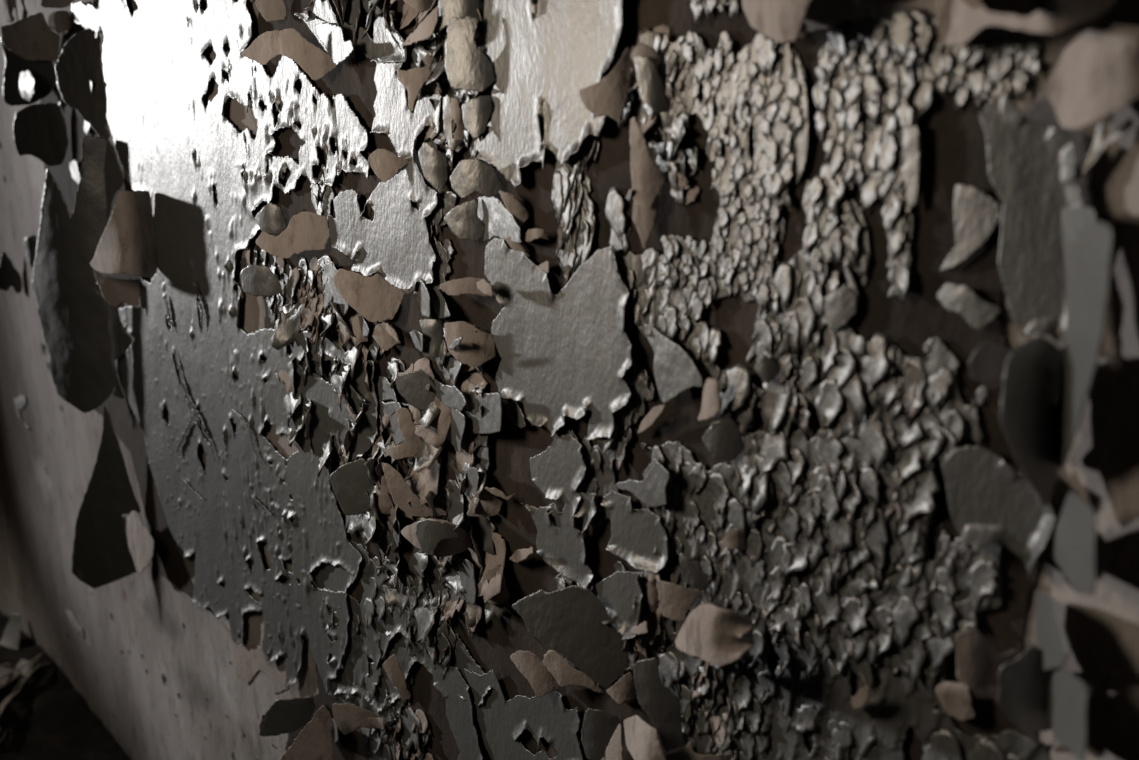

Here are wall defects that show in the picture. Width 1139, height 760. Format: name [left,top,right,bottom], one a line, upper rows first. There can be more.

peeling [0,0,583,760]
peeling [241,0,1139,760]